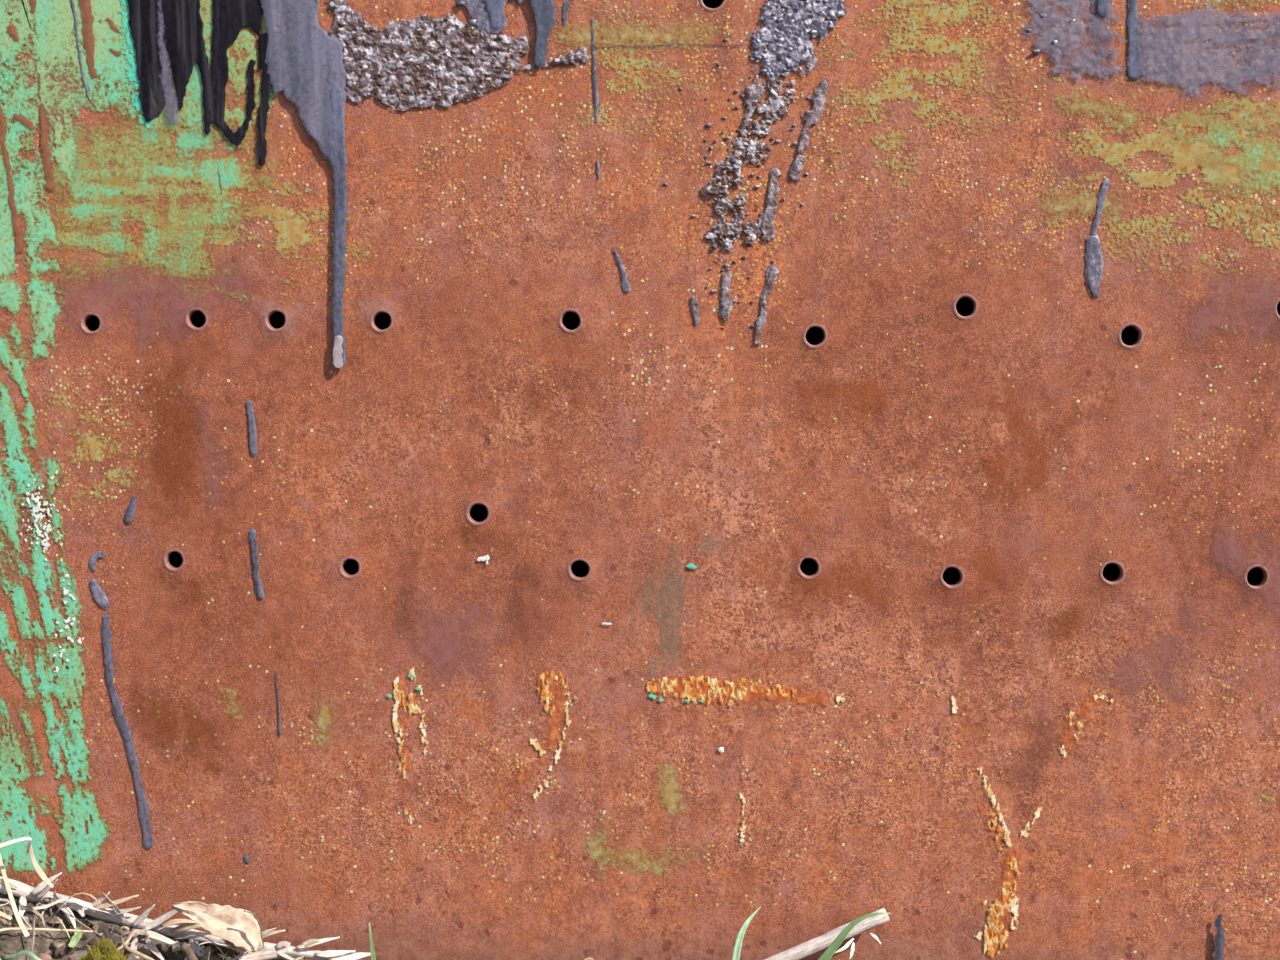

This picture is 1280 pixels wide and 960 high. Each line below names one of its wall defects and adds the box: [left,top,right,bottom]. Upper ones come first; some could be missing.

corrosion [78,0,121,79]
peeling [1053,94,1137,129]
peeling [1168,107,1280,216]
peeling [1038,189,1126,227]
peeling [0,0,276,875]